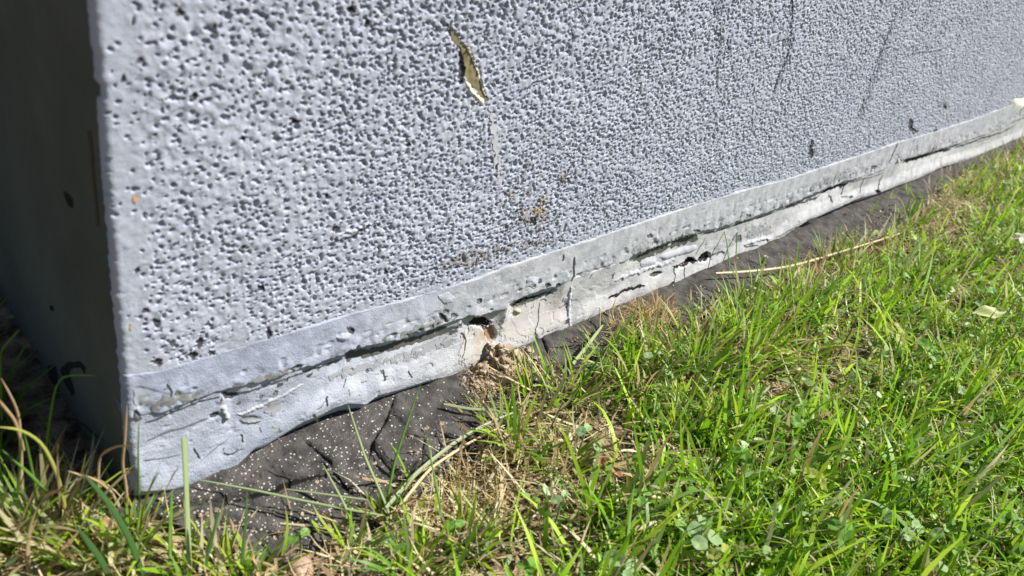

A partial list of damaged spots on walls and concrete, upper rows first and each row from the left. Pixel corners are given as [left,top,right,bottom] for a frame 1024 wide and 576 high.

spalling [449,25,488,105]
crack [333,224,381,243]
crack [674,107,1024,282]
spalling [469,316,515,366]
crack [512,254,645,354]